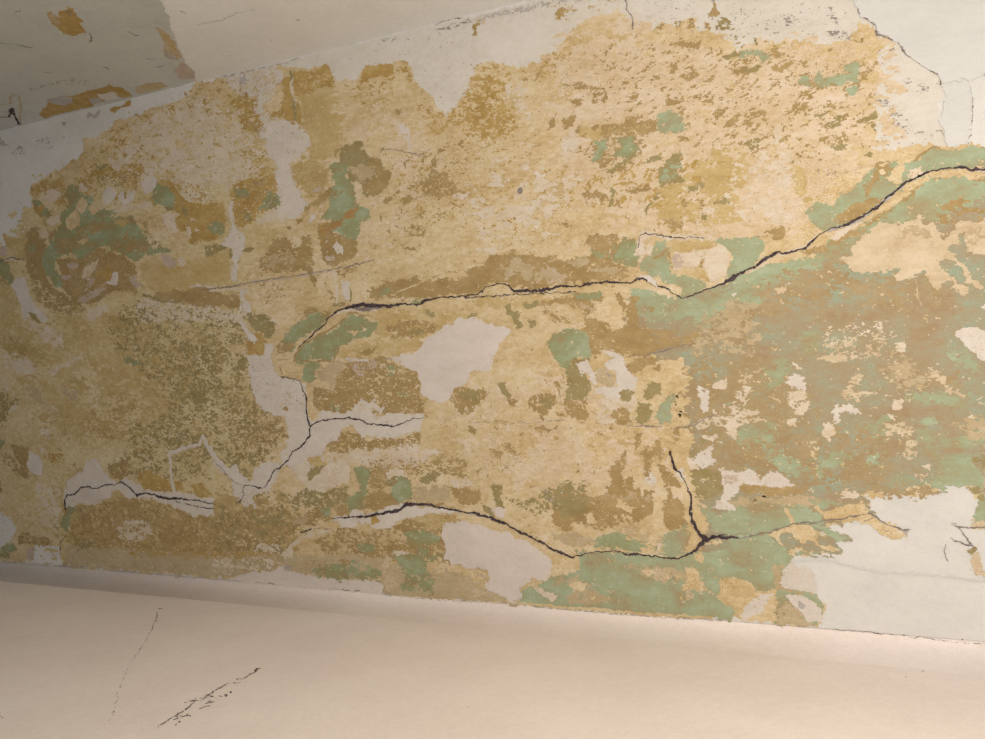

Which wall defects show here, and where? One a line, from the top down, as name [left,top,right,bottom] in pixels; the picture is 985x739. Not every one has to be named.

crack [857,8,941,85]
crack [299,97,985,347]
peeling [0,0,985,582]
crack [213,376,421,503]
crack [283,414,911,560]
peeling [519,569,570,602]
peeling [642,565,740,621]